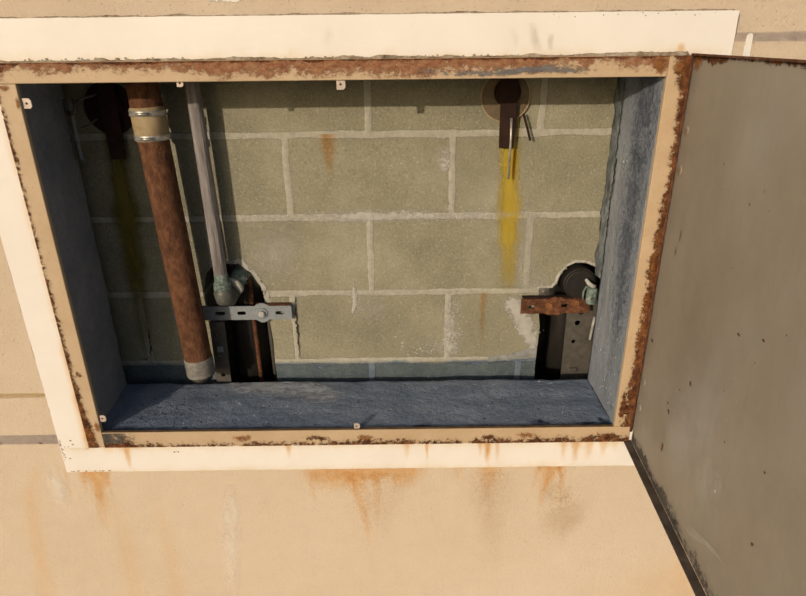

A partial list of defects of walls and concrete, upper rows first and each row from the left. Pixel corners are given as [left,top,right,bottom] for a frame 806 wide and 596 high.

water stain [500,119,519,258]
water stain [300,199,491,229]
corrosion [0,55,806,448]
spalling [225,258,271,303]
spalling [537,260,595,289]